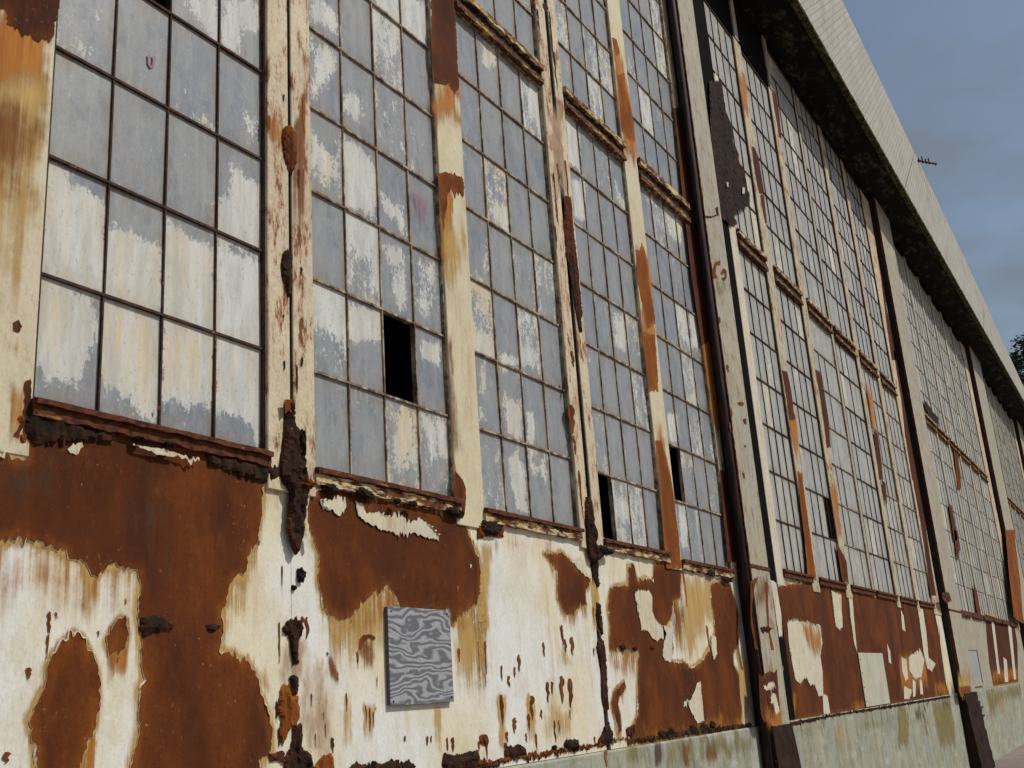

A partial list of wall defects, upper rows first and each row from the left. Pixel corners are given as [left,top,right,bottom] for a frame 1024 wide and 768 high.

corrosion [0,0,60,280]
corrosion [431,0,461,124]
corrosion [612,38,637,163]
corrosion [739,74,749,112]
corrosion [752,146,767,223]
corrosion [772,92,781,138]
corrosion [674,108,747,433]
corrosion [0,379,275,768]
corrosion [304,466,491,732]
corrosion [427,244,971,768]
corrosion [973,529,1023,686]
corrosion [349,758,416,768]